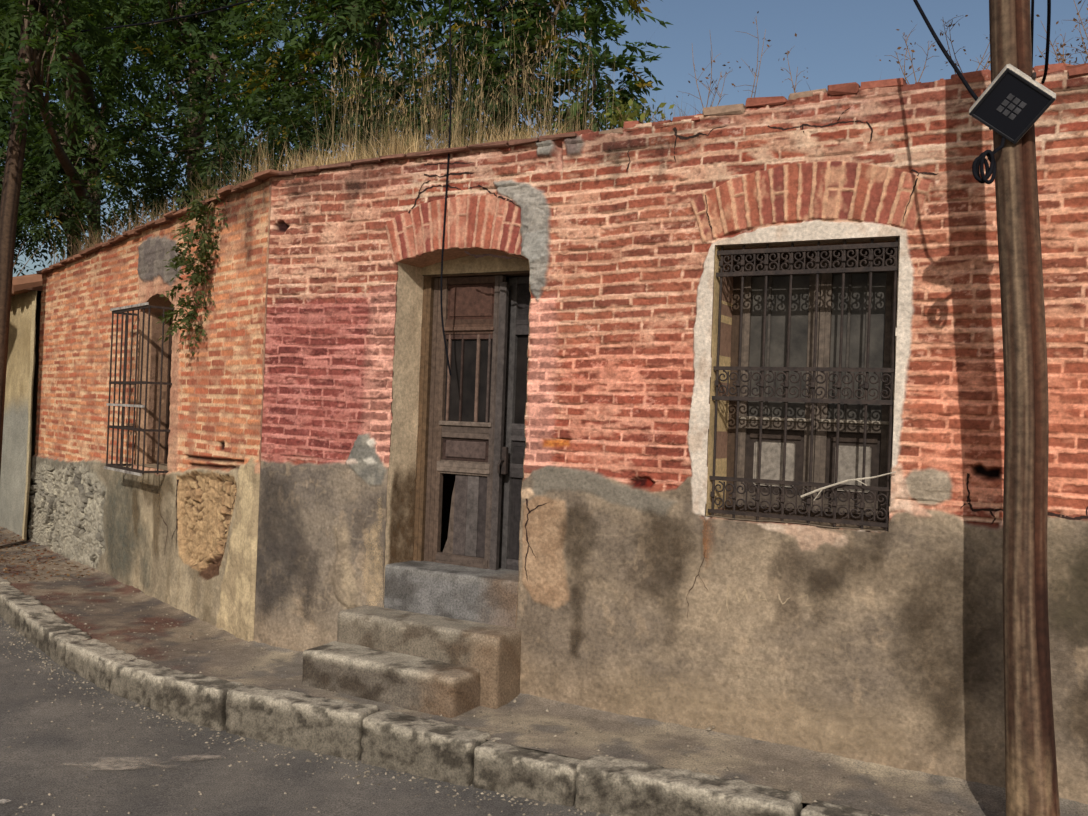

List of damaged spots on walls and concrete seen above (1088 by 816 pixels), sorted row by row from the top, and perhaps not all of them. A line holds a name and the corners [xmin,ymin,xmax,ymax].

crack [673,126,725,162]
crack [767,107,873,141]
crack [408,162,518,213]
spalling [177,470,237,580]
crack [524,499,549,581]
leakage [646,519,691,587]
crack [961,473,1003,525]
crack [1048,507,1088,520]
leakage [571,620,581,654]
leakage [903,562,987,735]